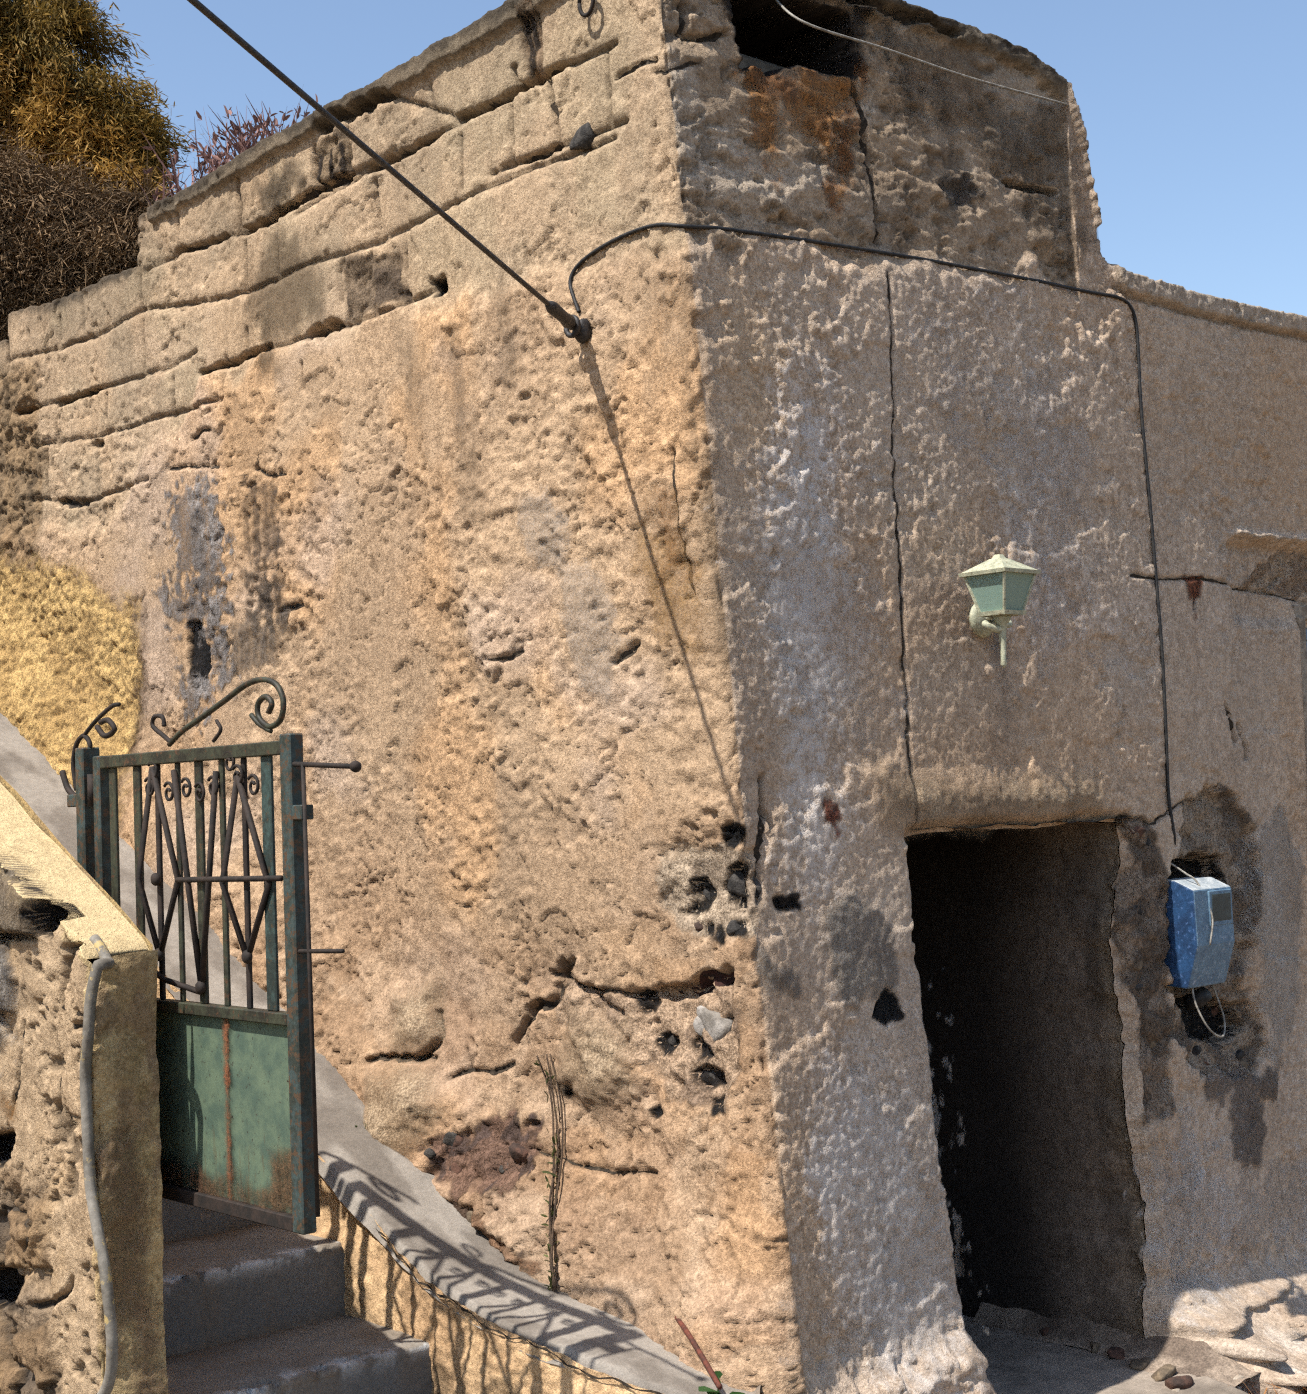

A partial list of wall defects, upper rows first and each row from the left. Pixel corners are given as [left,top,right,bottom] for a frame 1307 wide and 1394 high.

corrosion [742,61,868,212]
crack [850,82,879,242]
crack [672,451,696,594]
crack [887,272,918,824]
spalling [1244,552,1307,600]
spalling [656,843,760,937]
spalling [413,1109,543,1275]
crack [376,1229,662,1394]